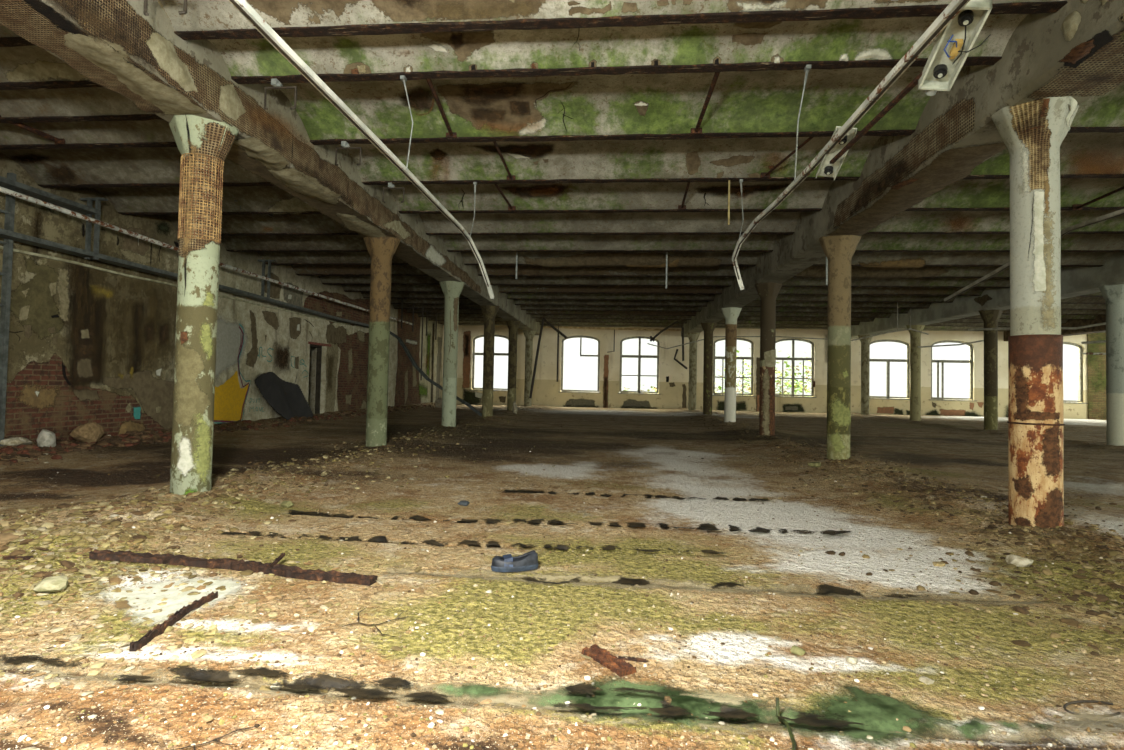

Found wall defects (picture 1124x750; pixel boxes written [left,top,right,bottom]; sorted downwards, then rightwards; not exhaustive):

flaking render [4,59,88,82]
flaking render [246,0,546,62]
damp [400,87,435,112]
peeling [568,1,637,16]
flaking render [727,0,828,46]
flaking render [10,258,70,340]
flaking render [246,273,370,412]
flaking render [4,323,213,495]
rust [761,349,776,436]
rust [1006,364,1063,528]